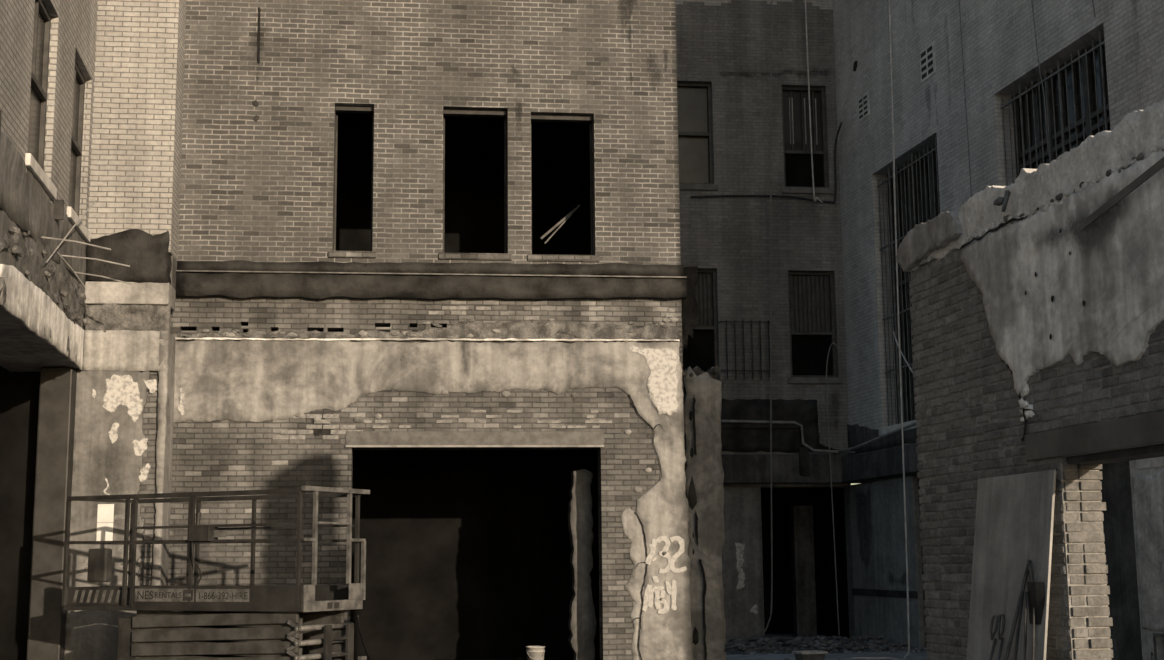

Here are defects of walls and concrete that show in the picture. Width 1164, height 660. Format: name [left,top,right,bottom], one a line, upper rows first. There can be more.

flaking render [961,139,1164,422]
flaking render [0,227,694,660]
crack [629,395,663,487]
crack [690,397,698,455]
crack [632,512,648,660]
crack [695,512,707,660]